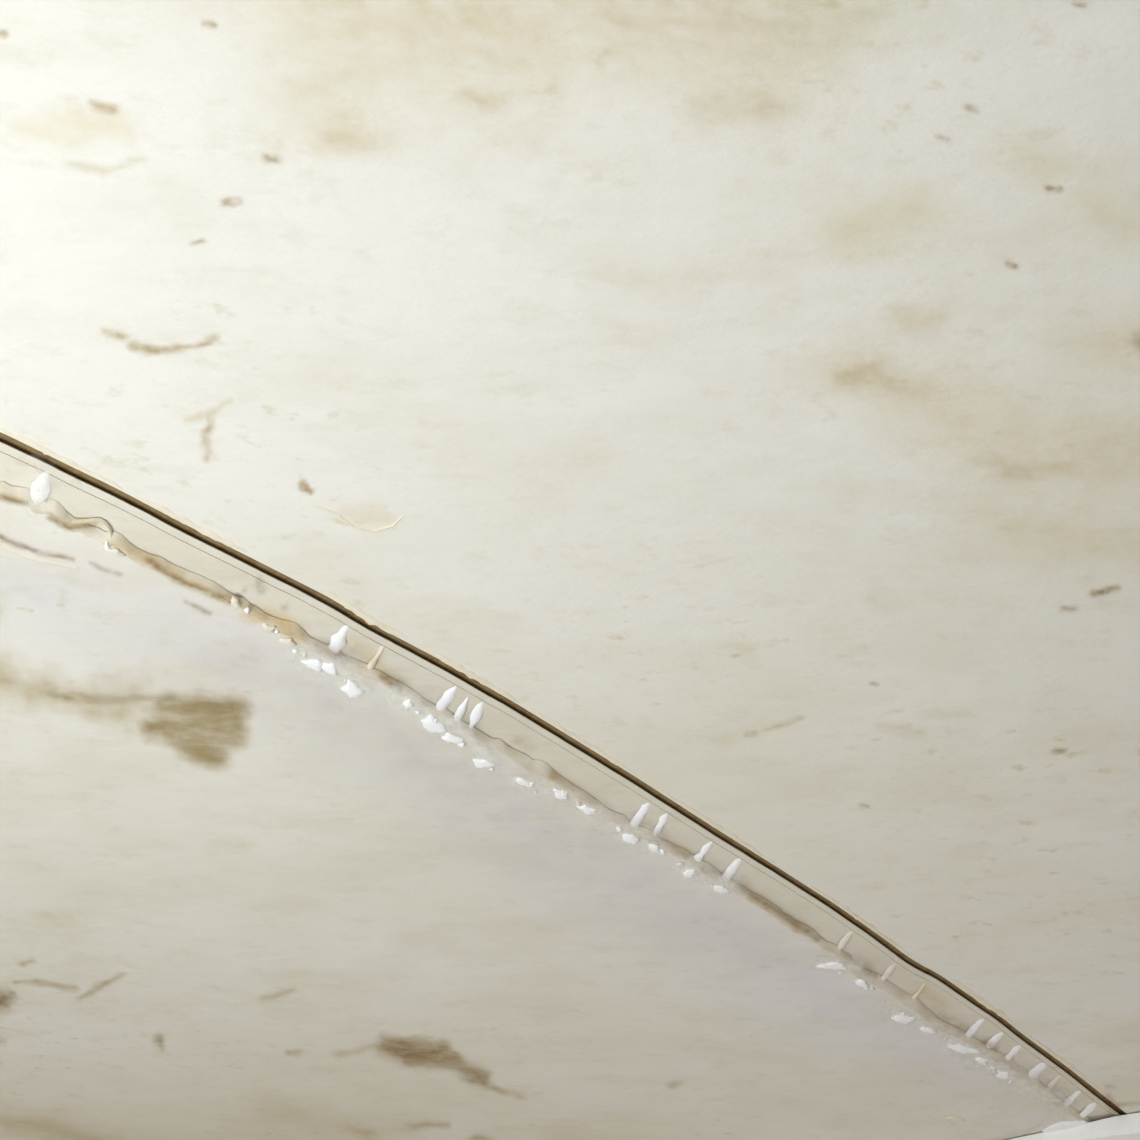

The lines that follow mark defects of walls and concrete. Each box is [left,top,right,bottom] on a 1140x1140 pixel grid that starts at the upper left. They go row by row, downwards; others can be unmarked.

crack [0,427,1127,1122]